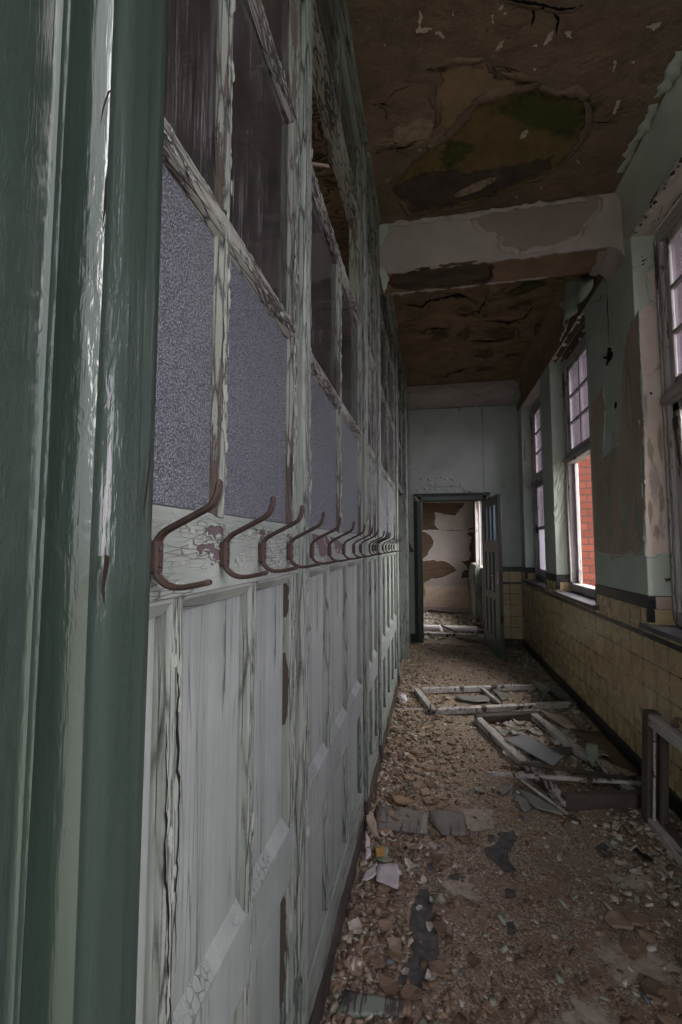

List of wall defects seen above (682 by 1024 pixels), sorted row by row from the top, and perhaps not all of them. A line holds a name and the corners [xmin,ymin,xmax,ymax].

crack [503,0,591,37]
peeling [617,46,682,173]
peeling [164,0,603,672]
peeling [590,259,670,562]
peeling [170,609,182,740]
peeling [282,653,310,782]
peeling [164,753,178,1024]
crack [164,613,180,1024]
peeling [280,862,309,1024]